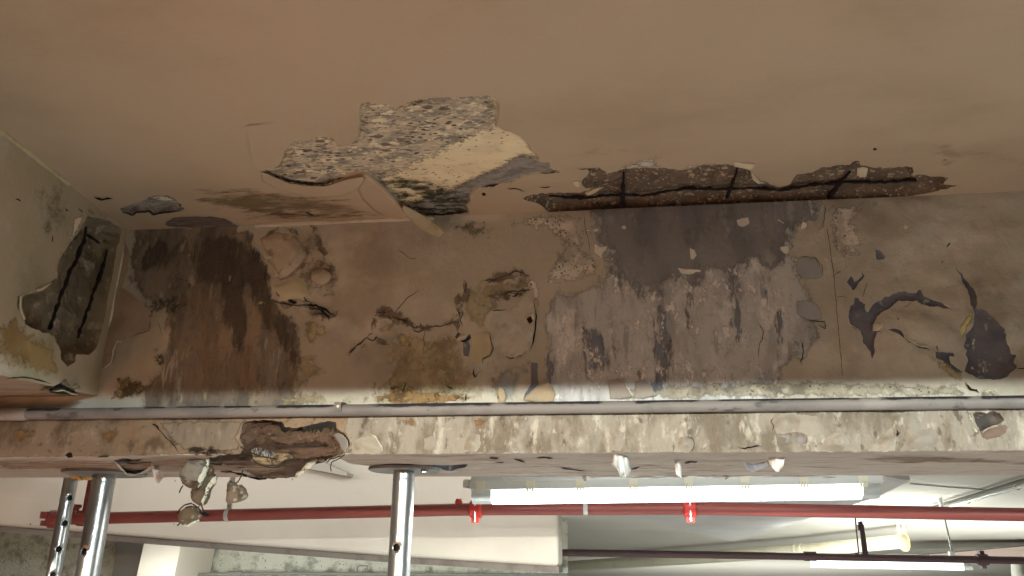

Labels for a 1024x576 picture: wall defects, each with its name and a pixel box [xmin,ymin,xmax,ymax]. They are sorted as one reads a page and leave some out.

water stain [197,191,356,219]
peeling [247,96,561,237]
water stain [111,225,344,408]
crack [347,270,531,354]
peeling [0,156,1024,483]